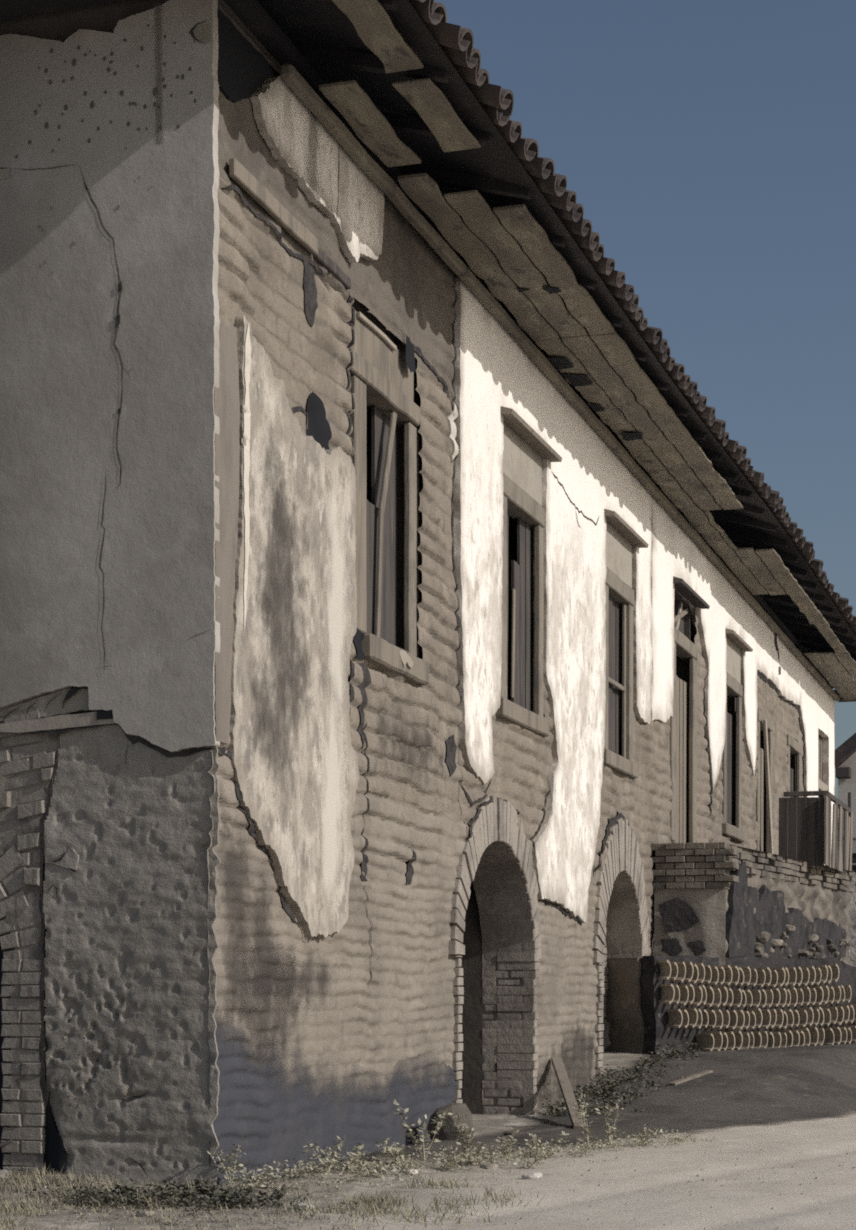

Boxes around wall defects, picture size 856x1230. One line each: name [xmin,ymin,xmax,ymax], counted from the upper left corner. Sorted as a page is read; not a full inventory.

spalling [81,62,196,122]
spalling [0,686,113,721]
crack [16,165,130,668]
leakage [258,492,305,763]
leakage [321,488,347,900]
flaking render [189,4,553,1094]
crack [553,473,599,526]
spalling [694,607,804,855]
leakage [208,852,457,1185]